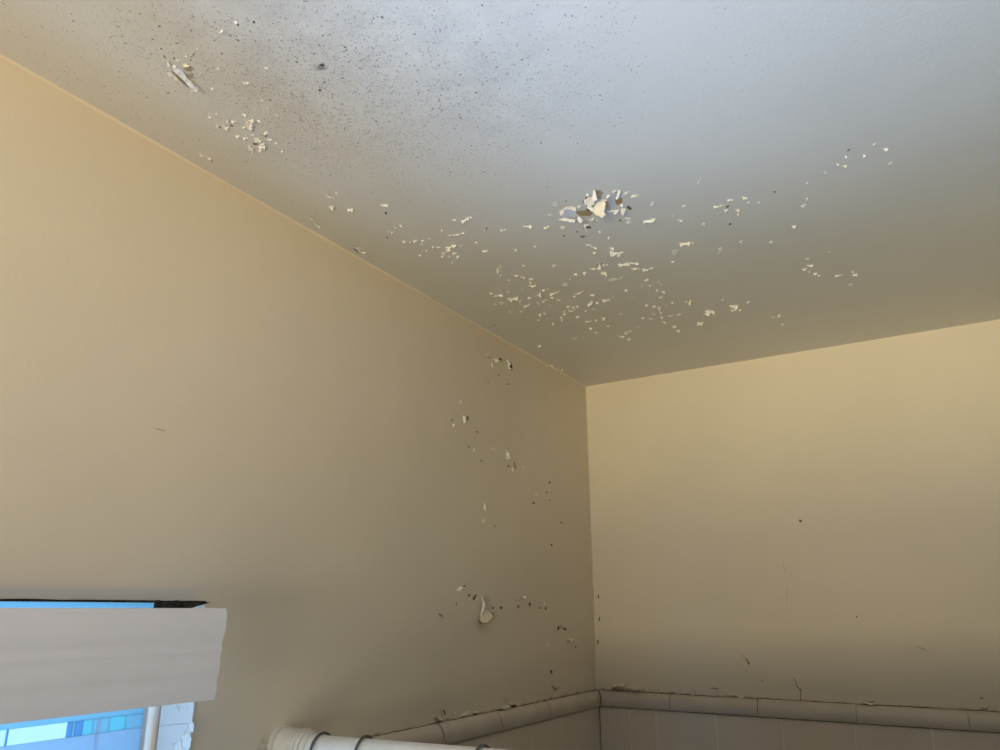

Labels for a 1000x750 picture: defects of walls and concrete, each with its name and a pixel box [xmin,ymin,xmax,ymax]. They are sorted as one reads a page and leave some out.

peeling [160,48,214,94]
peeling [207,100,283,158]
peeling [402,217,472,264]
peeling [490,189,692,341]
peeling [456,585,502,624]